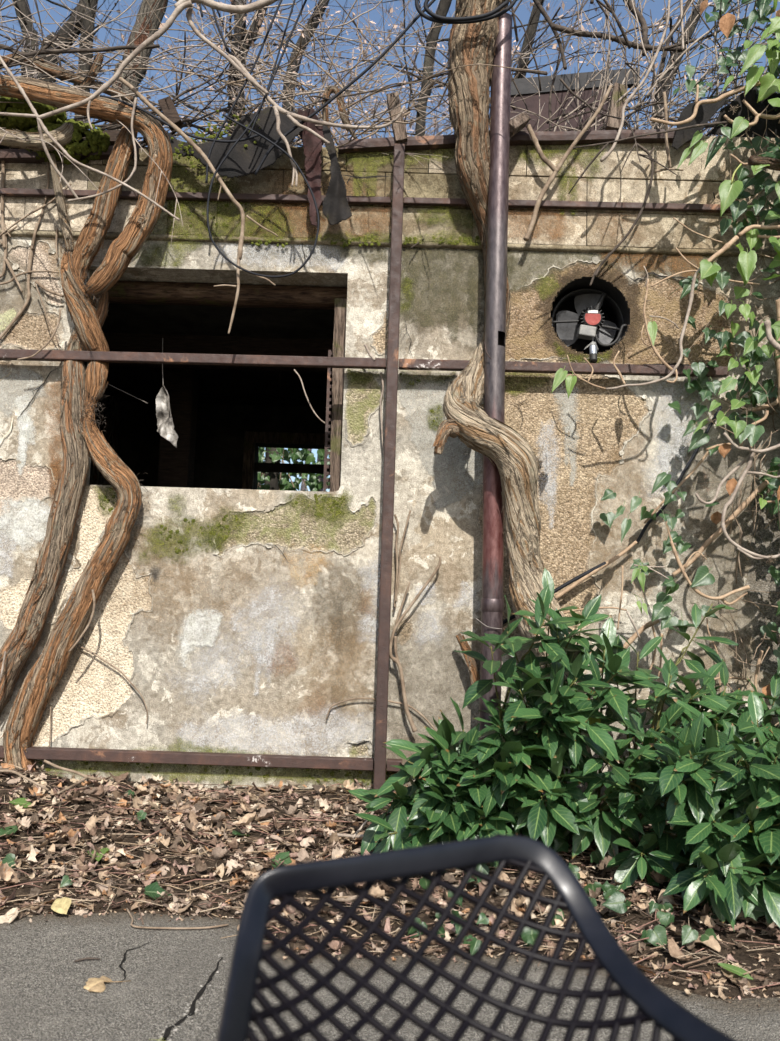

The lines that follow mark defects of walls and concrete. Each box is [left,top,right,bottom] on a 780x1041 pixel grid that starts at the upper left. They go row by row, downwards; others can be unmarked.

peeling [0,577,32,630]
peeling [0,457,59,518]
peeling [46,486,118,627]
peeling [32,549,155,747]
peeling [503,516,522,638]
peeling [505,257,738,631]